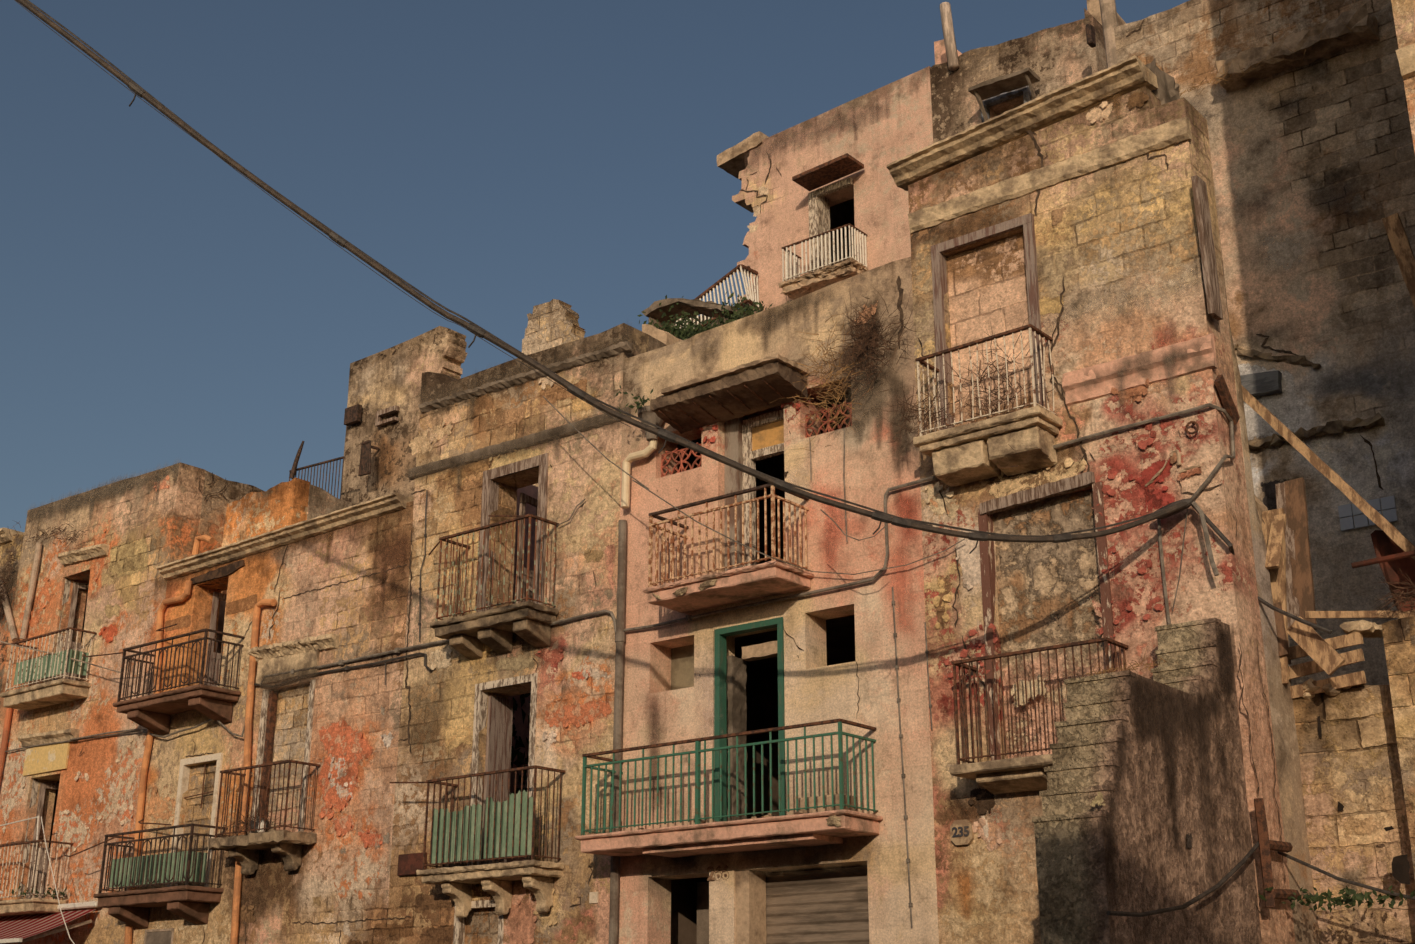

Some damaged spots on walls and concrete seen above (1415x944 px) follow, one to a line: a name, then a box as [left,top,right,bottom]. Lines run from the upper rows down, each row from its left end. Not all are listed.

crack [1048,276,1095,472]
crack [1256,334,1297,355]
peeling [989,378,1204,528]
peeling [924,482,981,629]
peeling [316,719,394,848]
peeling [535,648,612,681]
peeling [542,699,612,750]
damp [1117,631,1236,844]